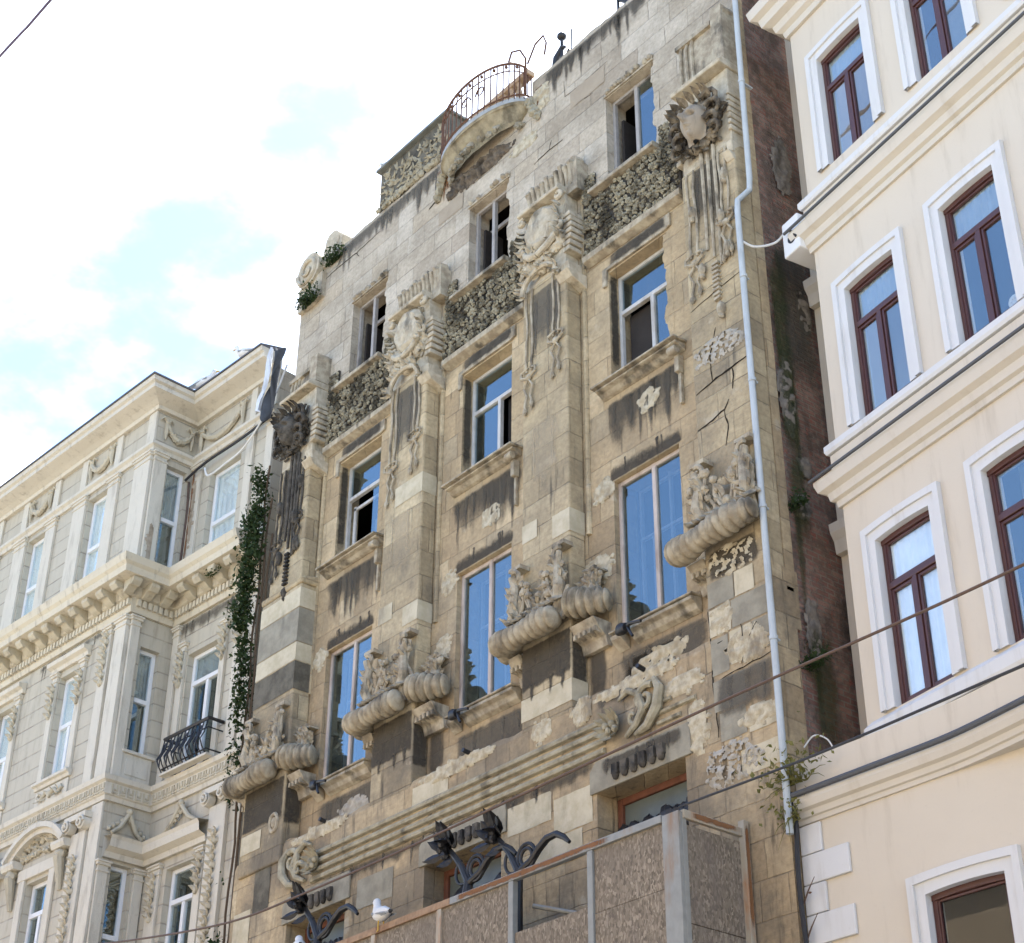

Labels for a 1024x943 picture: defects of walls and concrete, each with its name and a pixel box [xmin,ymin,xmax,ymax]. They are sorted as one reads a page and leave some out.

leakage [546,0,644,90]
spalling [446,129,538,201]
leakage [609,365,678,439]
crack [696,327,746,443]
leakage [771,247,817,453]
leakage [455,468,520,574]
spalling [702,536,756,577]
leakage [327,557,377,650]
spalling [569,635,776,791]
spalling [418,745,496,785]